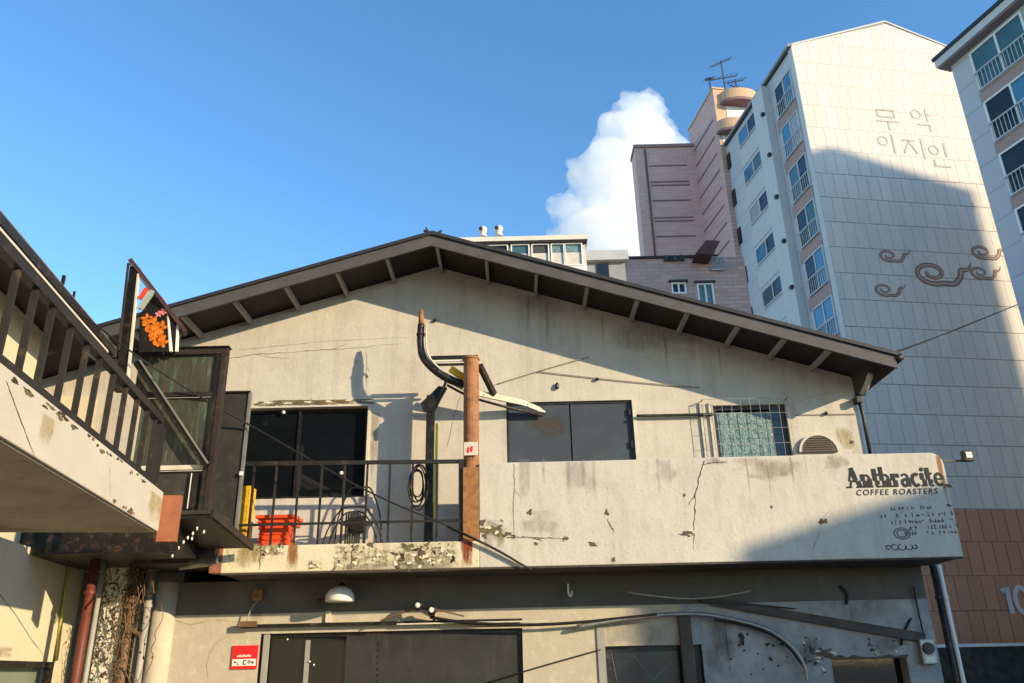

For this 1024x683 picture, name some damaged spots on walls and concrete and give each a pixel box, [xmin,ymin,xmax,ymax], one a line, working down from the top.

crack [229,337,404,384]
peeling [11,377,146,483]
crack [688,461,726,550]
peeling [479,519,516,539]
peeling [309,541,455,571]
corrosion [461,541,472,562]
spalling [725,632,788,675]
spalling [800,637,837,676]